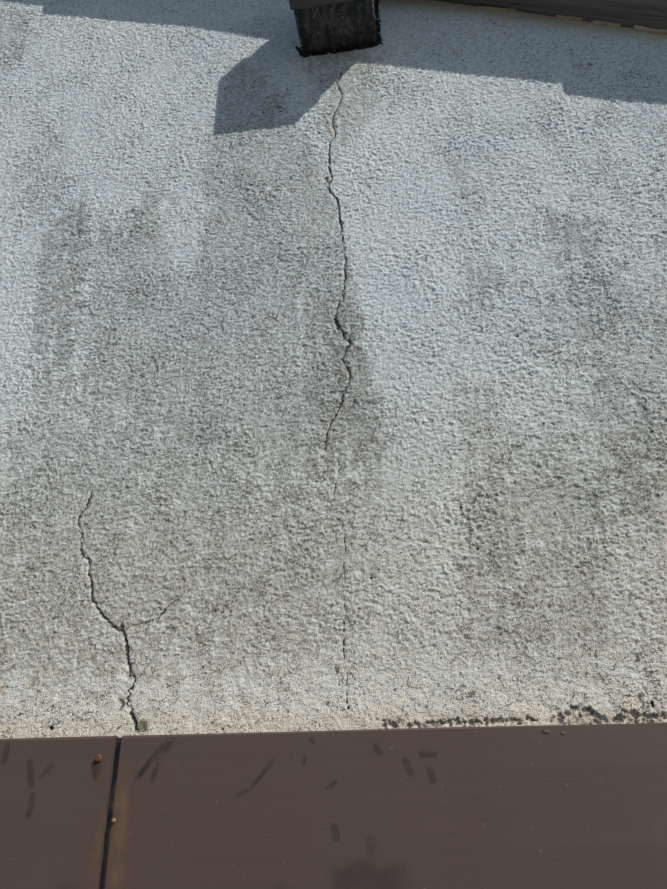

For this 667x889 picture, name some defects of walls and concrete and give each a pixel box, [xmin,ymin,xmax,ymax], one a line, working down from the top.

crack [77,493,195,731]
leakage [0,67,402,693]
crack [324,68,352,502]
crack [341,603,349,704]
leakage [455,207,667,681]